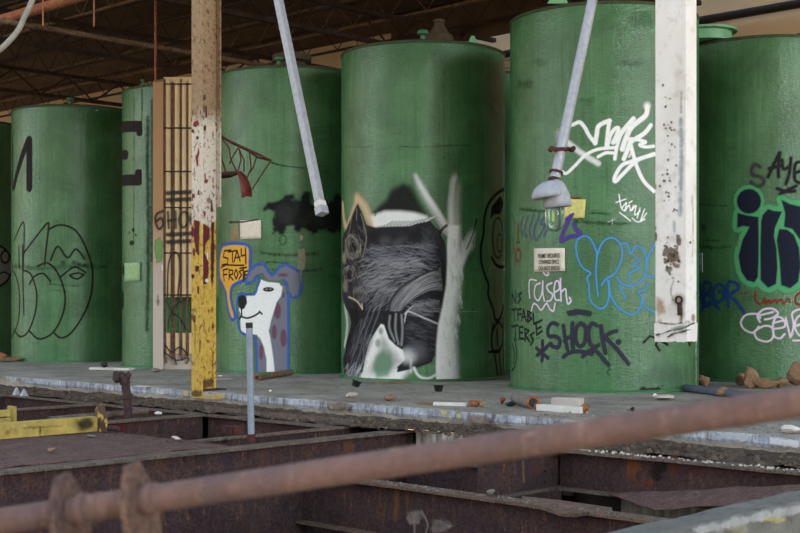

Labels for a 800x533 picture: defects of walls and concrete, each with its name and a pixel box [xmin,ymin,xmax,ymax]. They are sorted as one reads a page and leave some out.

peeling [191,198,215,293]
spalling [655,227,691,282]
rust [191,379,213,397]